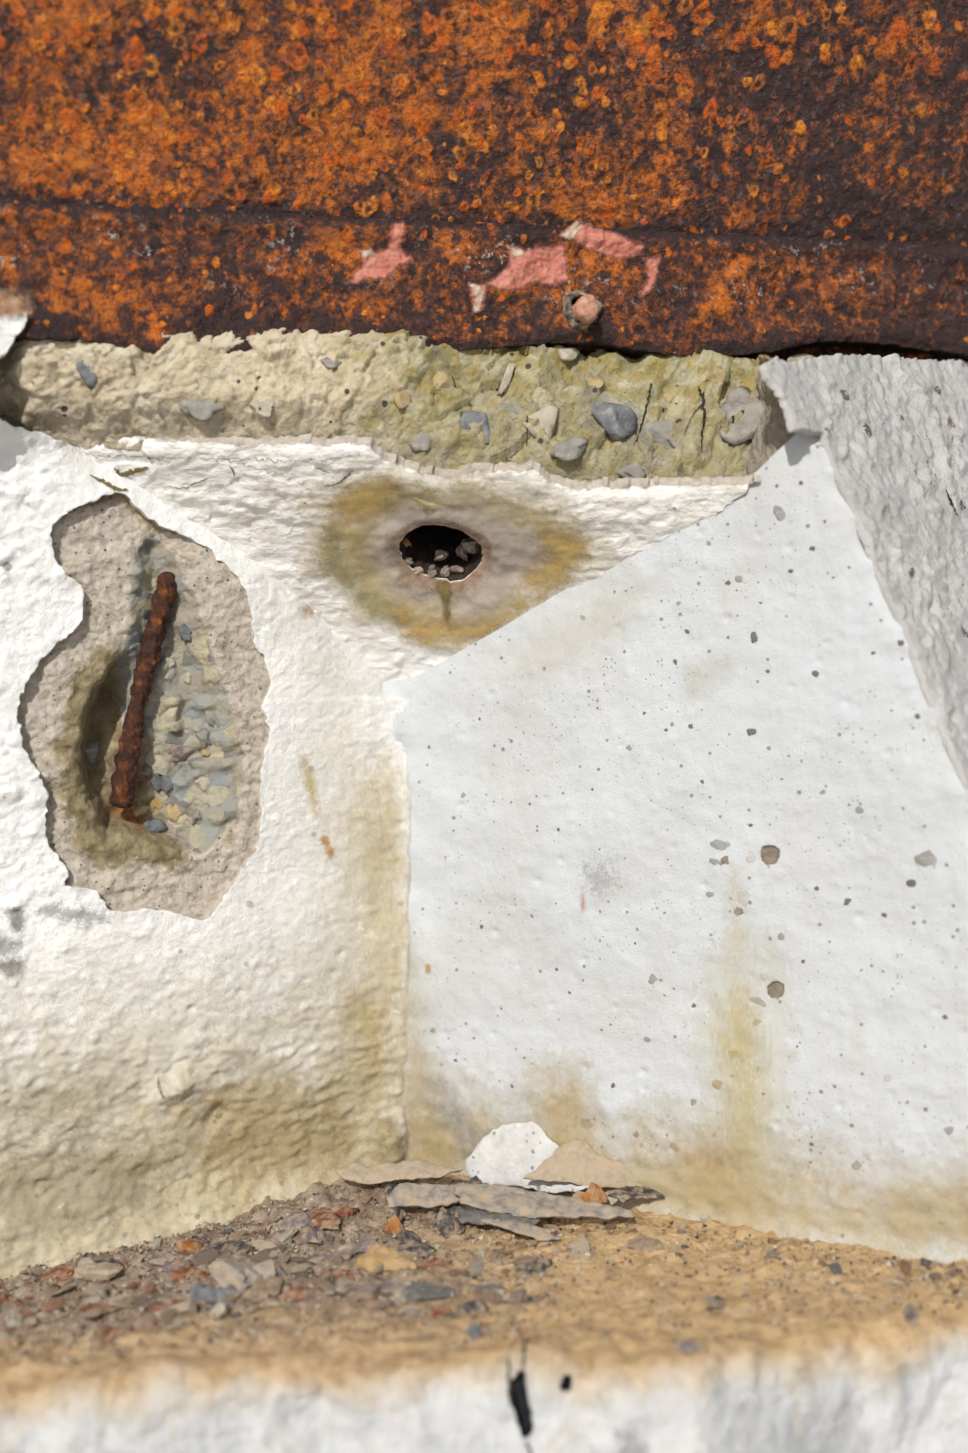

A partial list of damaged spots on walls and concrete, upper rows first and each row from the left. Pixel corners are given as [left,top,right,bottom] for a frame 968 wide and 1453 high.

corrosion [0,292,32,316]
spalling [0,327,797,483]
spalling [0,493,270,977]
peeling [335,1118,643,1226]
leakage [514,1094,968,1257]
crack [506,1337,573,1453]